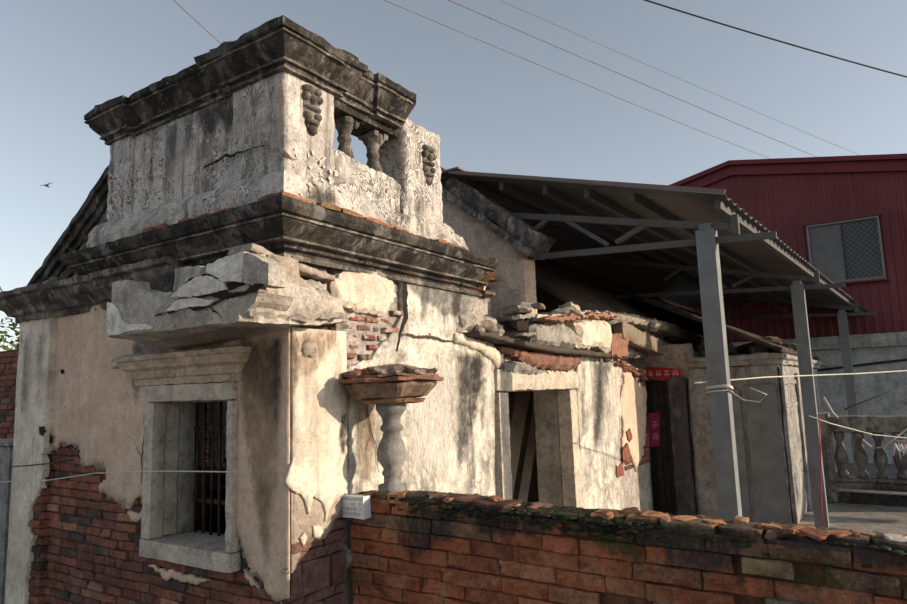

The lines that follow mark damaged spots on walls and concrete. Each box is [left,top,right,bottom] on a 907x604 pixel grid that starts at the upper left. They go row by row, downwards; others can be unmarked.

leakage [167,97,233,160]
crack [205,79,298,168]
spalling [106,251,286,336]
crack [396,282,459,352]
leakage [132,328,280,553]
peeling [284,308,404,546]
leakage [411,353,487,472]
leakage [583,358,619,445]
peeling [602,358,651,478]
peeling [39,426,272,604]